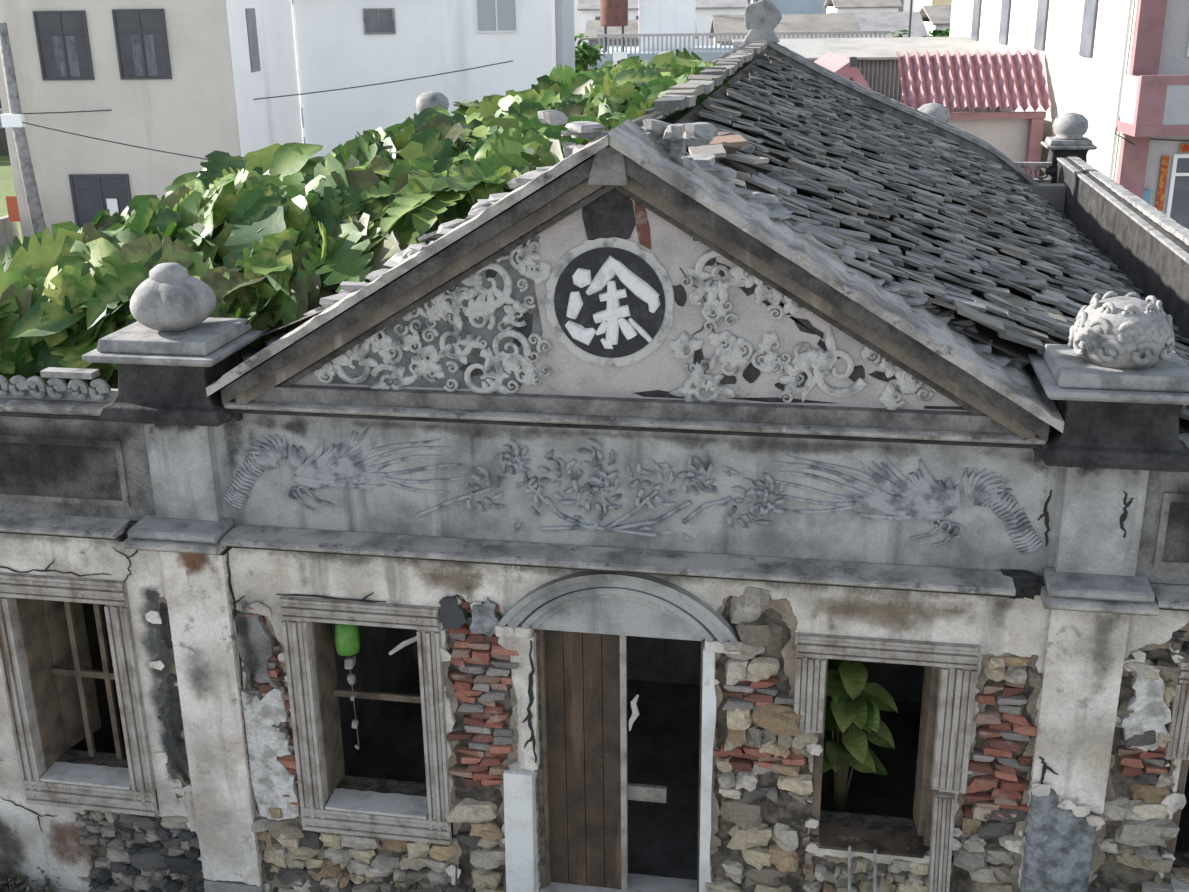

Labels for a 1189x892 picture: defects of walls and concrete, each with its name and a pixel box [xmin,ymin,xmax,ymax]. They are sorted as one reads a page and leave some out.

crack [0,547,138,581]
spalling [234,595,523,892]
spalling [705,587,930,892]
spalling [949,655,1042,892]
spalling [1087,621,1189,892]